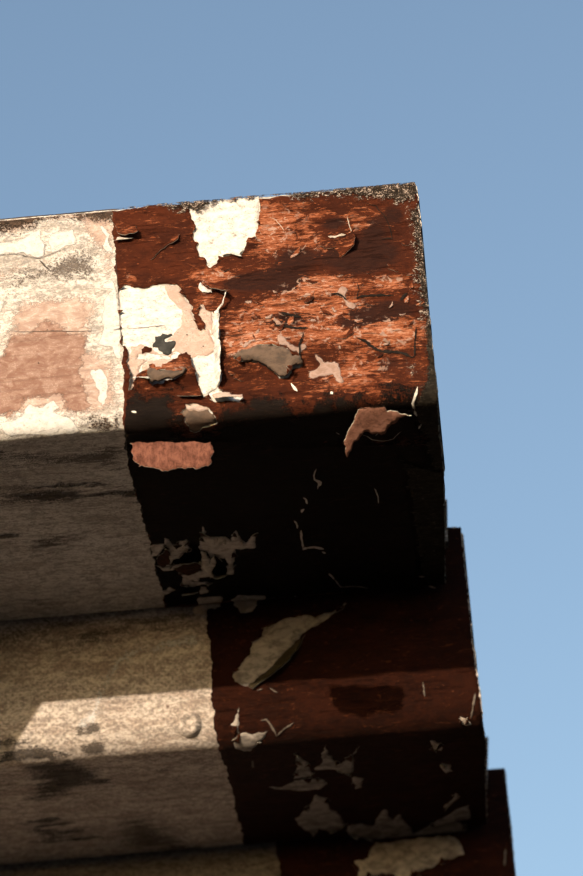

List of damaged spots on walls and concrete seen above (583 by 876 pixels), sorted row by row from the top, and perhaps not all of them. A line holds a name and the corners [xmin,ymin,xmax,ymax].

peeling [0,211,132,274]
peeling [190,196,260,272]
peeling [239,300,304,334]
peeling [304,279,363,339]
peeling [0,281,244,432]
peeling [151,527,266,615]
peeling [232,602,347,688]
peeling [229,709,267,751]
peeling [271,747,471,876]